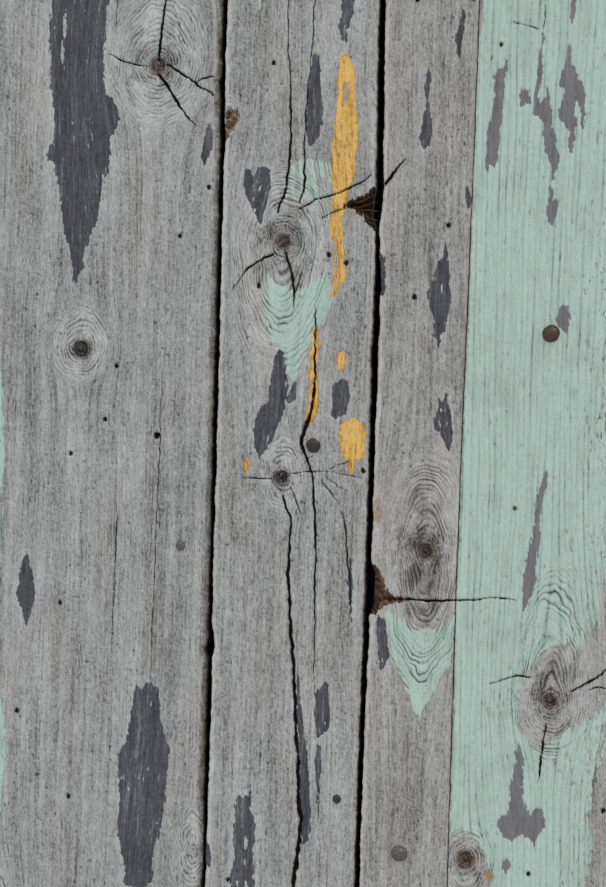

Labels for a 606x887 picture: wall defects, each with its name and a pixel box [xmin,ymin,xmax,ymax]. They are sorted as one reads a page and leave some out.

peeling [47,0,120,285]
crack [108,0,214,124]
crack [232,252,295,308]
peeling [243,0,359,472]
crack [277,0,406,218]
peeling [331,350,368,475]
peeling [376,0,606,887]
crack [250,310,361,887]
crack [385,595,514,603]
peeling [117,682,170,887]
peeling [229,784,256,887]
crack [537,724,547,783]